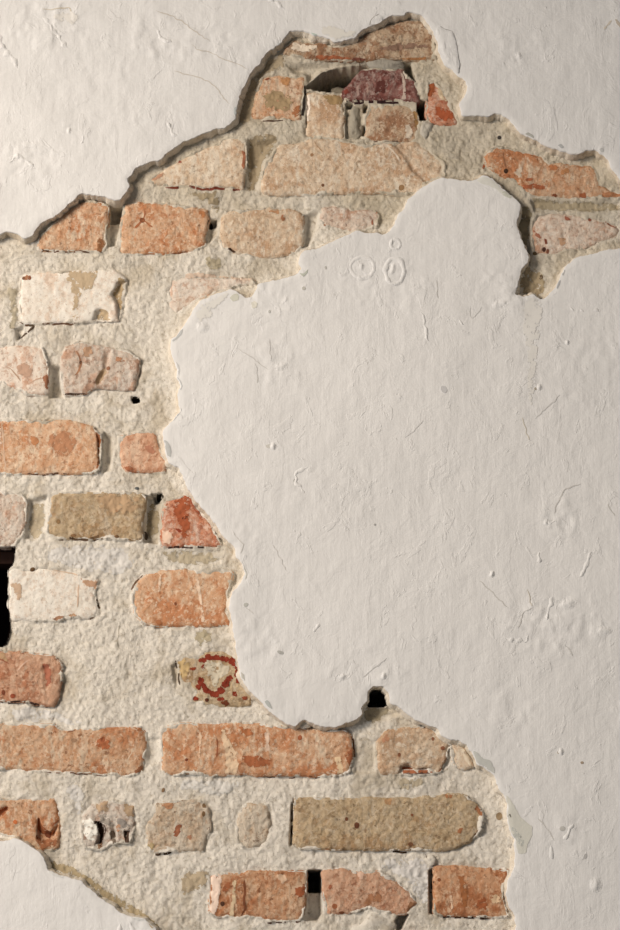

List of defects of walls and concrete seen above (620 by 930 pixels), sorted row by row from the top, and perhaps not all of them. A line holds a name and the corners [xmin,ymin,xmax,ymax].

spalling [113,278,125,310]
spalling [0,546,16,647]
spalling [398,737,447,774]
spalling [35,835,57,849]
peeling [496,796,532,854]